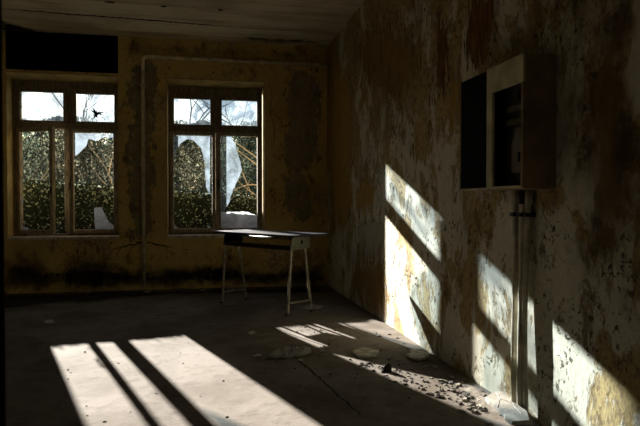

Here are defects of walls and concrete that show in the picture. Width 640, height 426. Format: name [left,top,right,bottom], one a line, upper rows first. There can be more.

peeling [122,59,160,242]
peeling [429,0,500,138]
water stain [569,0,640,259]
peeling [349,235,417,321]